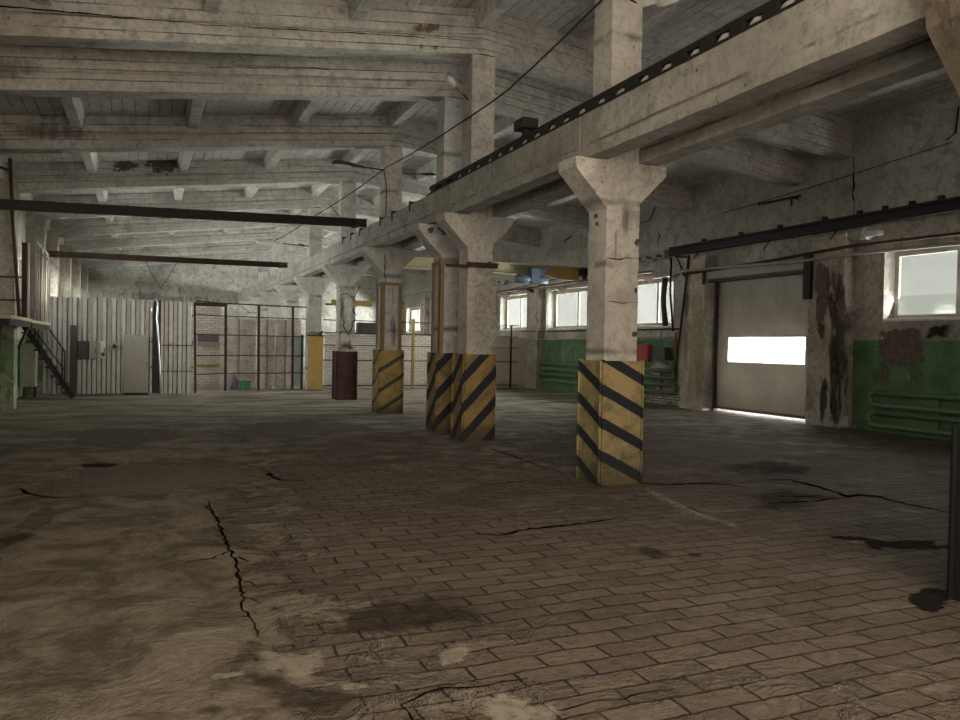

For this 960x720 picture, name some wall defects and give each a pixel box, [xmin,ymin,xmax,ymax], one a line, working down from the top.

peeling [879,327,925,383]
spalling [819,387,848,428]
crack [642,481,745,489]
crack [770,479,949,513]
crack [477,517,622,536]
crack [189,501,260,636]